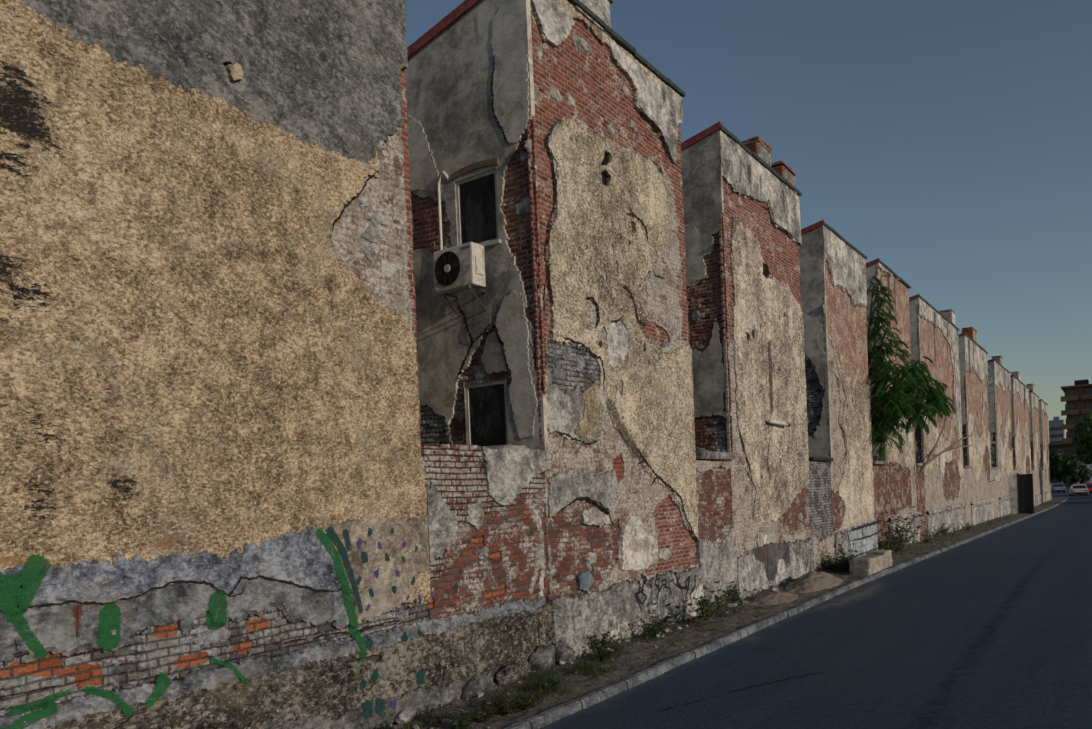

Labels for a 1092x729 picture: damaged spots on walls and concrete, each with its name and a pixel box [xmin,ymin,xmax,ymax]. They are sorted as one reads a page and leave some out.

damp [0,61,70,180]
crack [491,56,510,148]
damp [0,247,64,316]
spalling [328,0,1048,581]
crack [633,443,699,543]
crack [0,575,373,637]
spalling [0,490,620,714]
crack [266,617,412,646]
crack [0,682,74,698]
crack [113,711,146,729]